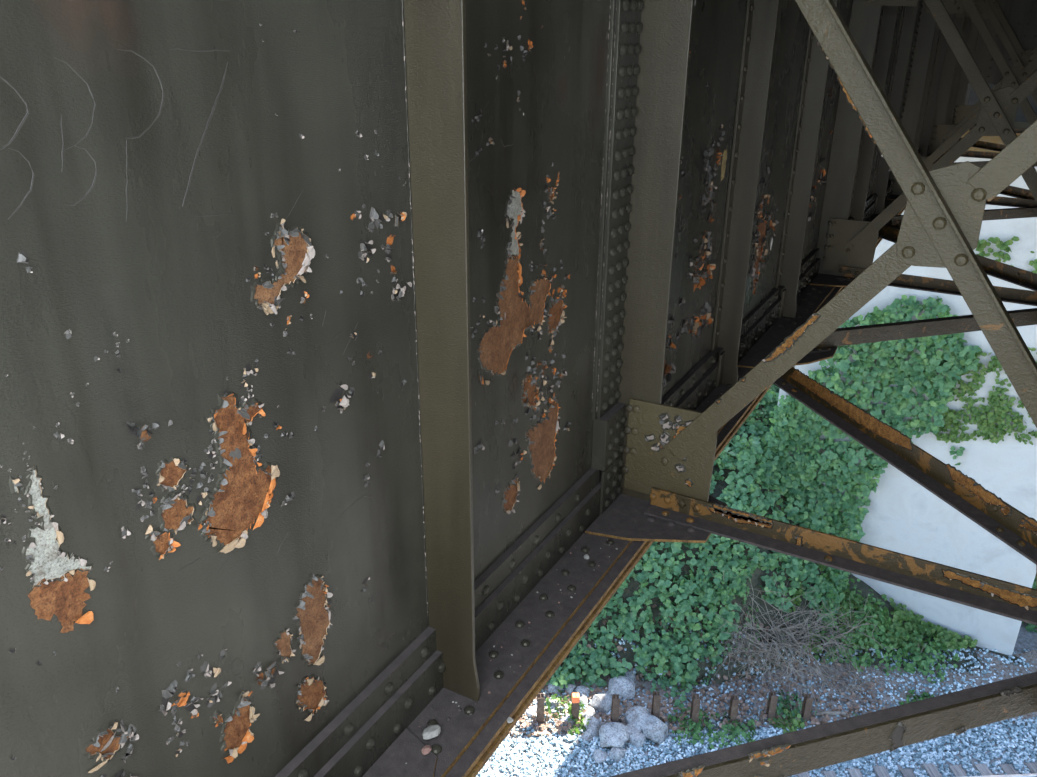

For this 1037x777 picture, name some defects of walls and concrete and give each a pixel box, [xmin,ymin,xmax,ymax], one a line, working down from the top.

peeling [246,213,329,355]
peeling [351,204,412,302]
peeling [470,161,572,514]
peeling [0,443,113,633]
peeling [127,358,295,560]
corrosion [706,504,774,529]
corrosion [946,464,1037,536]
corrosion [941,568,1037,610]
peeling [159,573,333,764]
peeling [80,720,139,777]
corrosion [678,764,706,777]
corrosion [748,743,792,767]